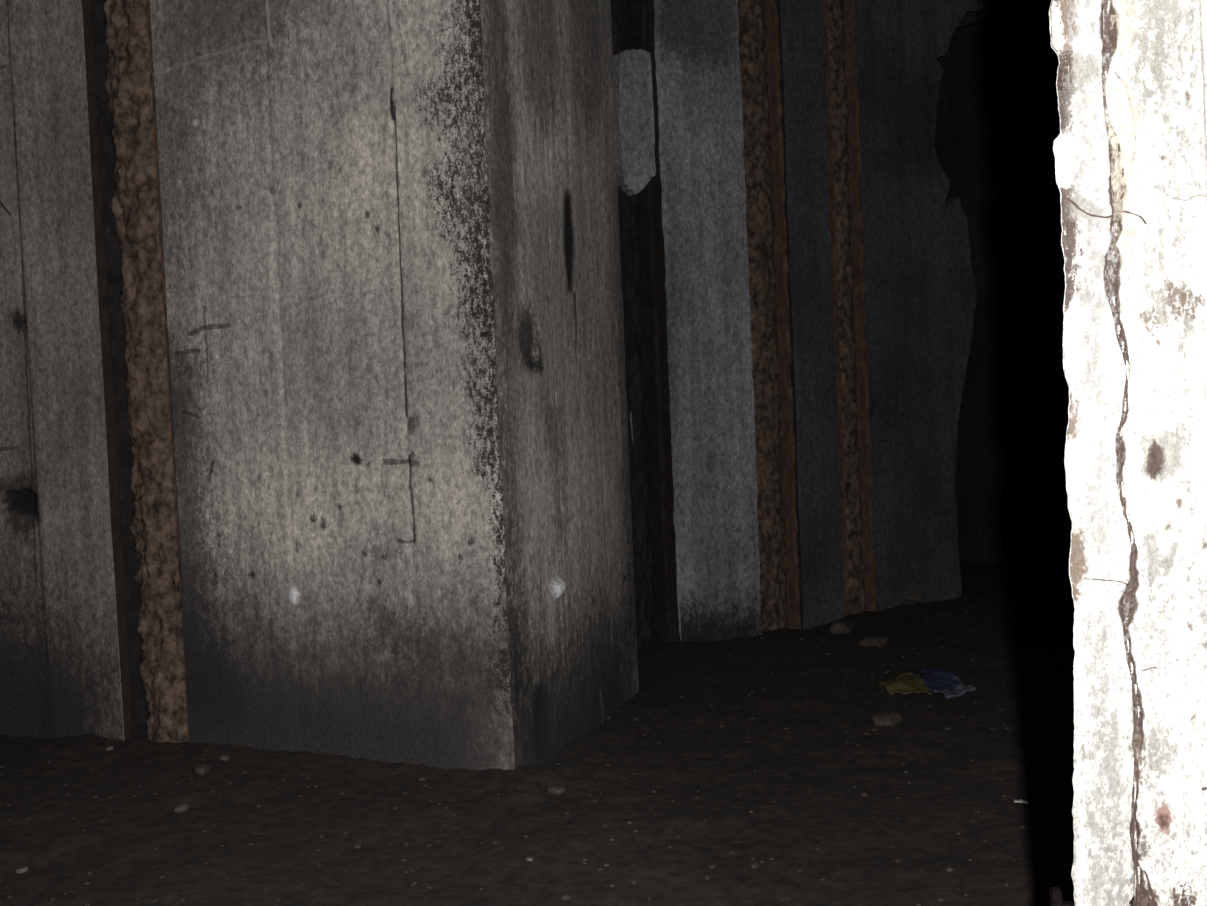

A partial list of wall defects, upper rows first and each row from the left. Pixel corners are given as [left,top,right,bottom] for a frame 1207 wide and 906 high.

spalling [1050,0,1103,316]
spalling [1067,389,1080,440]
spalling [1070,528,1088,615]
crack [1067,0,1161,906]